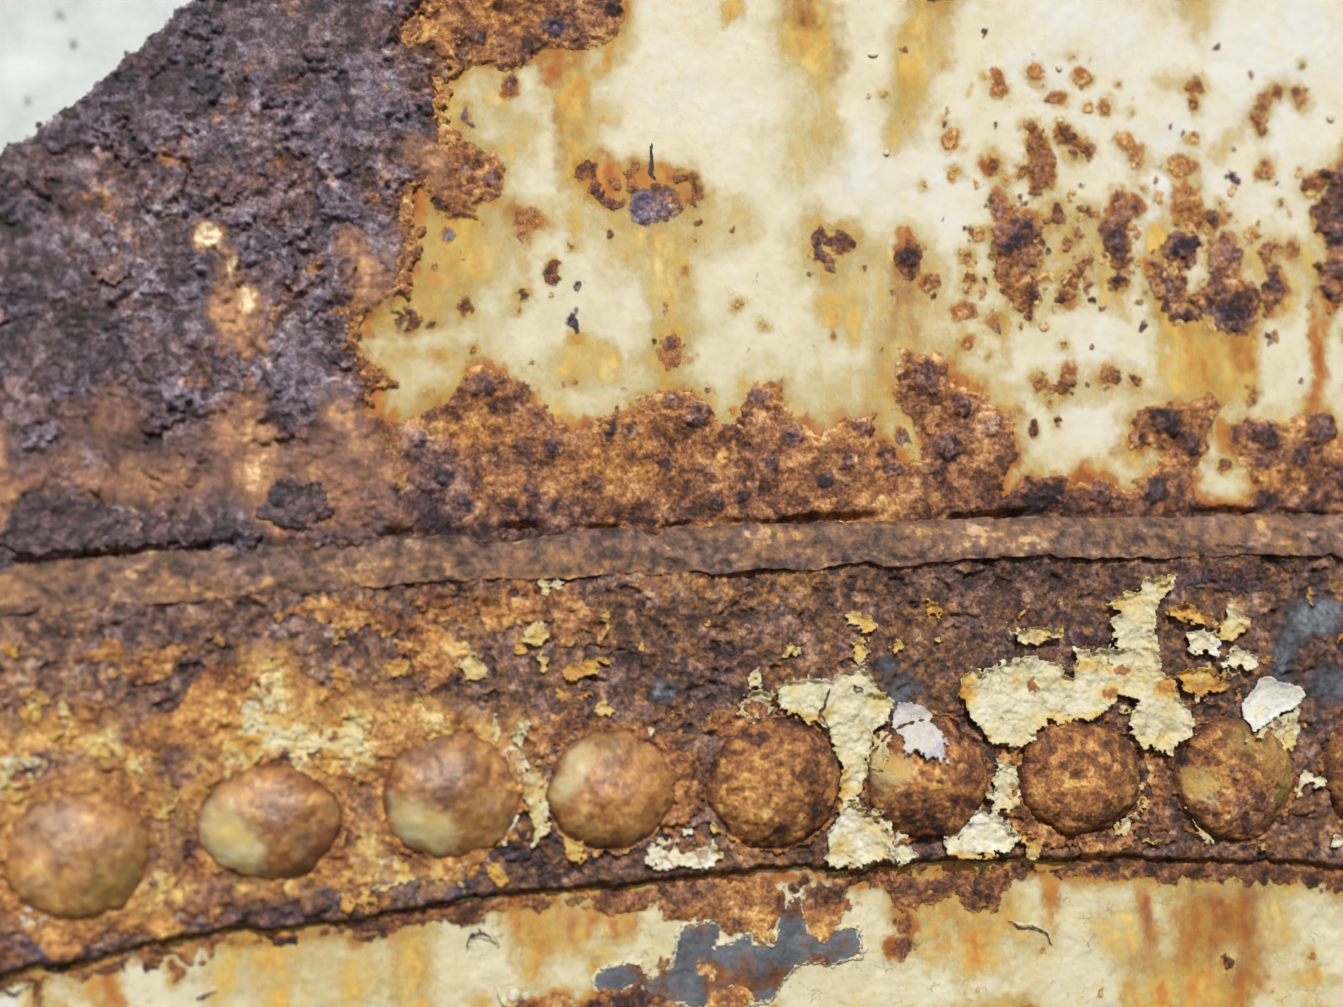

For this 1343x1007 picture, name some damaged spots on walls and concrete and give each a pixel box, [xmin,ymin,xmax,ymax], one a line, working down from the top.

rust [0,0,1343,572]
rust [1169,559,1269,597]
peeling [601,611,611,631]
peeling [926,598,943,621]
peeling [1,641,38,658]
peeling [382,657,410,678]
peeling [943,574,1343,860]
peeling [736,613,950,872]
rust [0,579,1343,1007]
peeling [486,862,509,887]
peeling [591,890,868,1007]